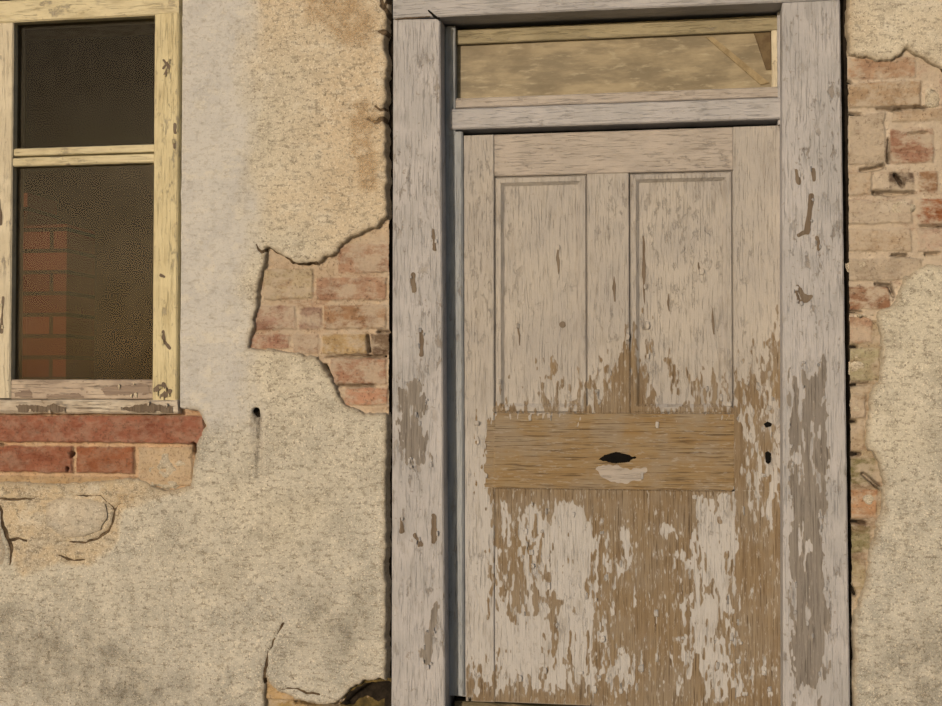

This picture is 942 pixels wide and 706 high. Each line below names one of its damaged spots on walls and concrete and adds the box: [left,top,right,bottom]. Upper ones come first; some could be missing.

spalling [0,382,206,490]
spalling [250,218,433,468]
spalling [845,51,942,615]
spalling [266,678,392,706]